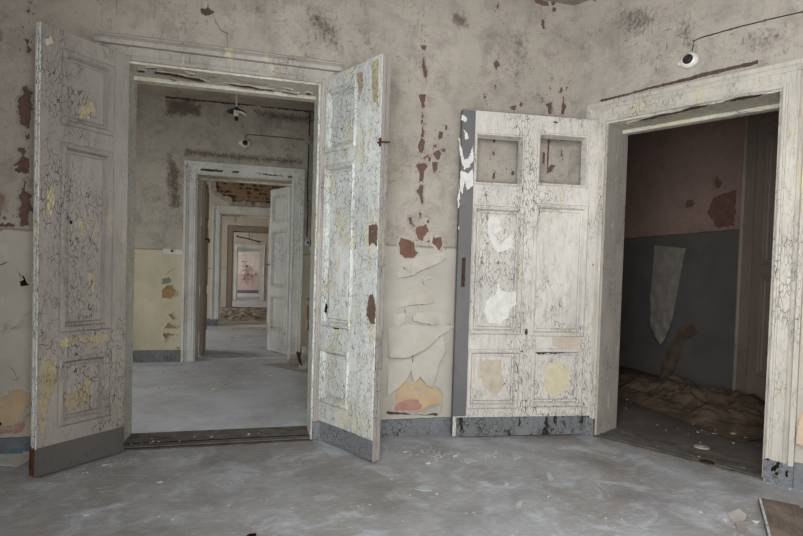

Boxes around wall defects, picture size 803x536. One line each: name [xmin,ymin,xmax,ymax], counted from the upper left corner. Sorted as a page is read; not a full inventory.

peeling [419,40,429,80]
peeling [0,84,35,231]
peeling [394,94,447,260]
peeling [160,277,178,301]
peeling [161,311,181,350]
peeling [0,386,31,435]
peeling [387,376,444,416]